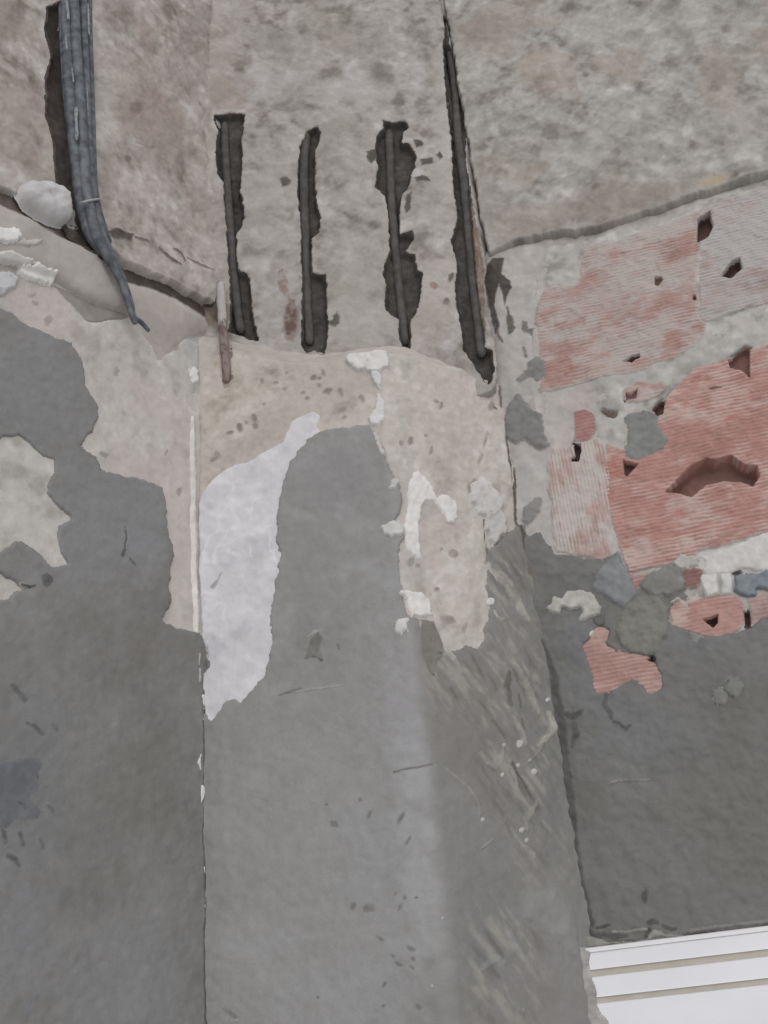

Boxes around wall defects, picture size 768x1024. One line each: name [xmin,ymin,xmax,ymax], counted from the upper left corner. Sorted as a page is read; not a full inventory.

corrosion [202,297,218,324]
peeling [0,1,514,651]
flaking render [530,182,768,644]
flaking render [304,629,325,662]
flaking render [583,627,662,694]